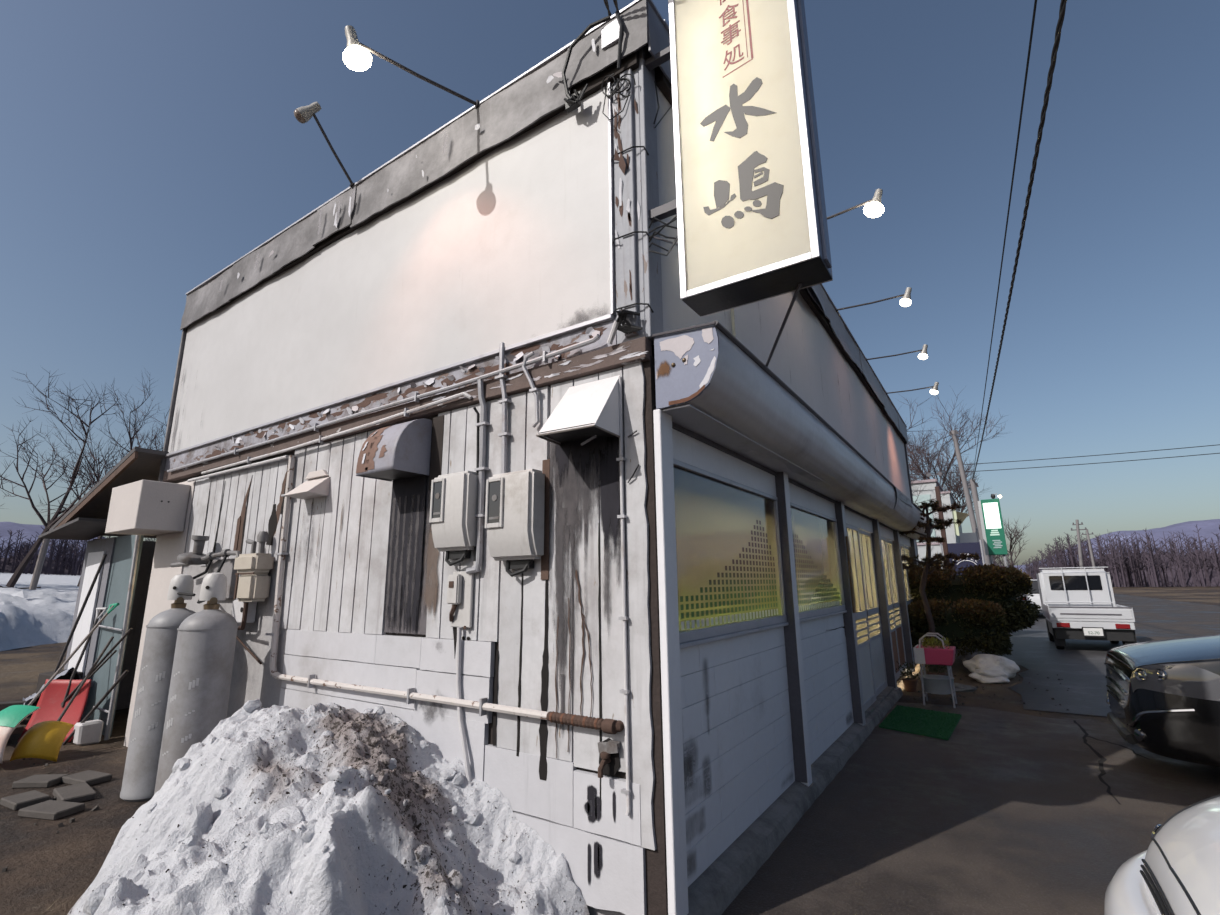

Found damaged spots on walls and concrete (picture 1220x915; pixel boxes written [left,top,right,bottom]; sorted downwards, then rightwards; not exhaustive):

peeling [205,327,716,458]
corrosion [657,361,670,376]
leakage [549,436,620,732]
corrosion [549,711,604,730]
leakage [683,746,695,788]
crack [1073,720,1148,804]